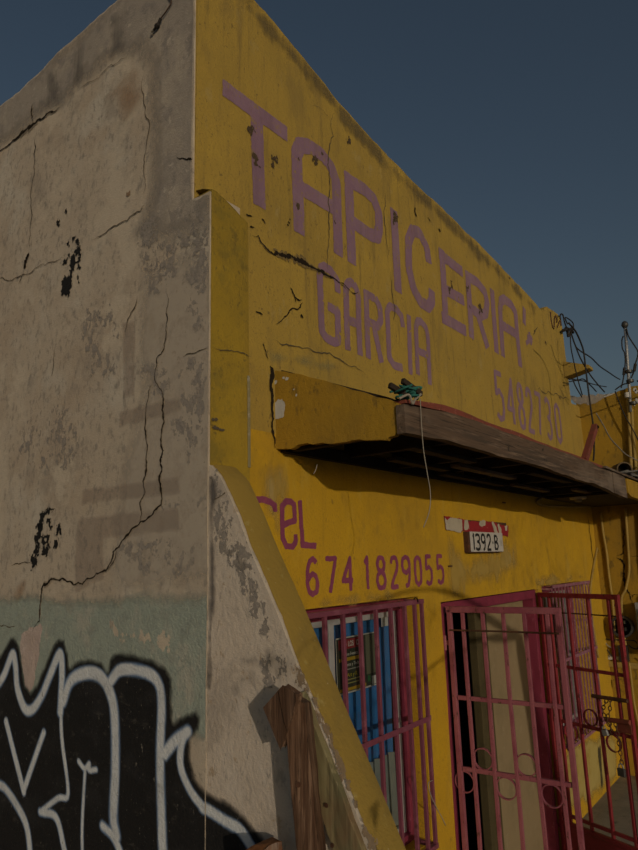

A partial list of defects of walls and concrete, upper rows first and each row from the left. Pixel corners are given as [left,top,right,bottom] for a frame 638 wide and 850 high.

crack [0,104,67,281]
crack [141,78,150,187]
crack [247,105,358,295]
crack [34,288,360,627]
crack [606,531,638,617]